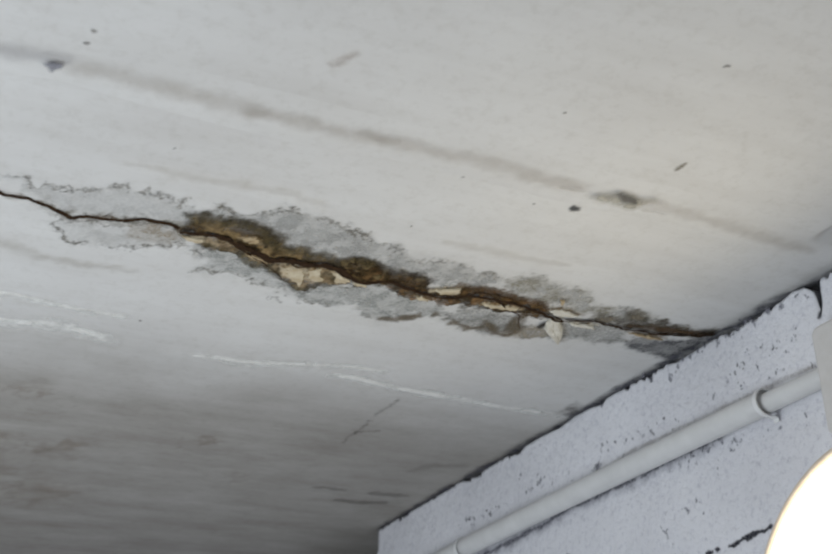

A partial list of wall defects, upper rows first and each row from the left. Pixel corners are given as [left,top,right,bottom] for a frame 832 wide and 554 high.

crack [0,191,715,338]
spalling [177,213,598,345]
crack [705,524,772,554]